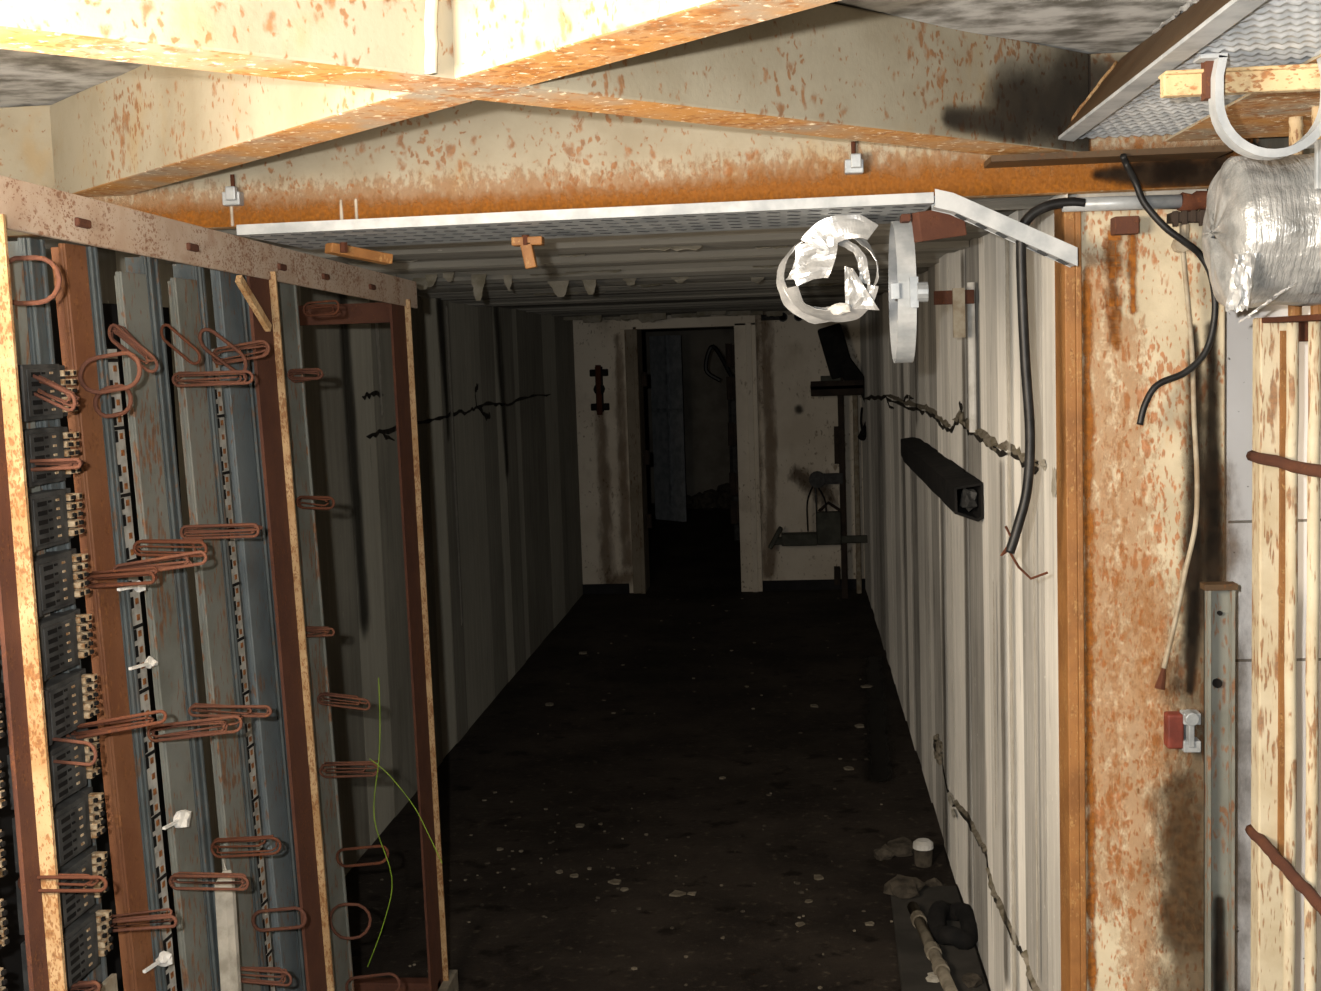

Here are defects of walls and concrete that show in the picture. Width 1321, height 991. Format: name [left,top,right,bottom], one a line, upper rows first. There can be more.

rust [138,160,1208,228]
crack [362,391,383,400]
crack [366,383,551,441]
rust [1082,227,1137,991]
damp [1162,465,1236,991]